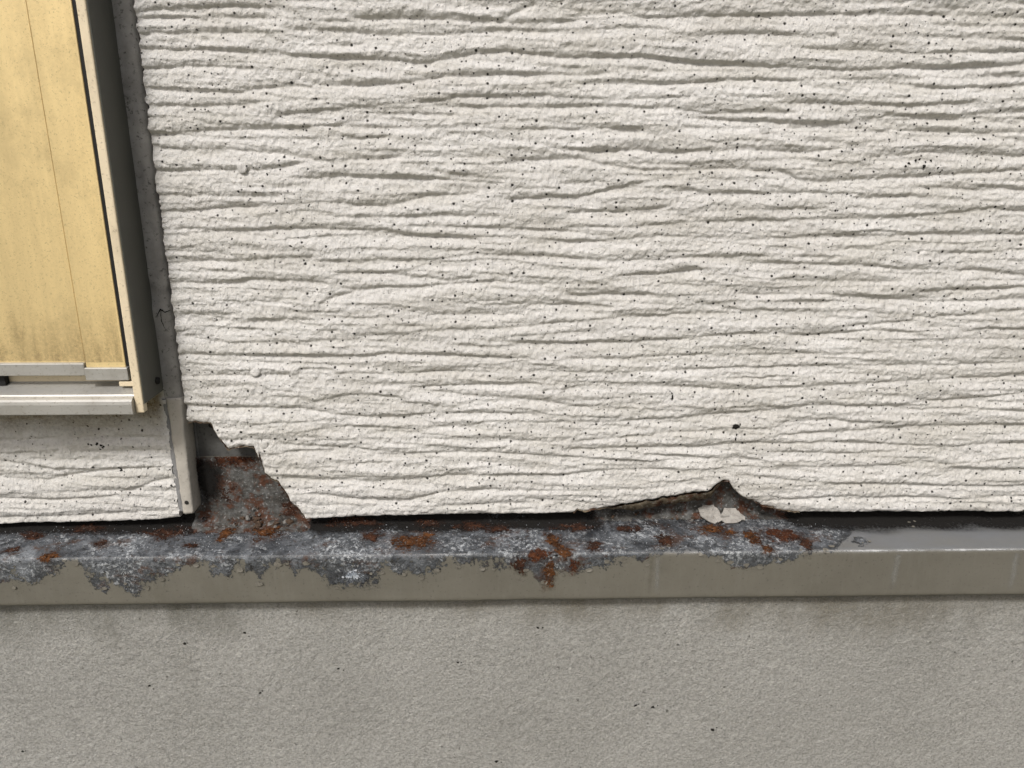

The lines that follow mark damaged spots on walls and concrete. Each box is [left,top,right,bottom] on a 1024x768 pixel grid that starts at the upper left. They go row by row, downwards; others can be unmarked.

corrosion [199,456,255,468]
corrosion [0,531,45,554]
corrosion [138,526,199,548]
corrosion [216,527,238,542]
corrosion [251,484,300,544]
corrosion [326,516,439,554]
peeling [0,421,871,597]
corrosion [510,522,605,588]
corrosion [616,524,640,533]
corrosion [654,534,678,547]
corrosion [691,522,813,554]
corrosion [331,556,370,589]